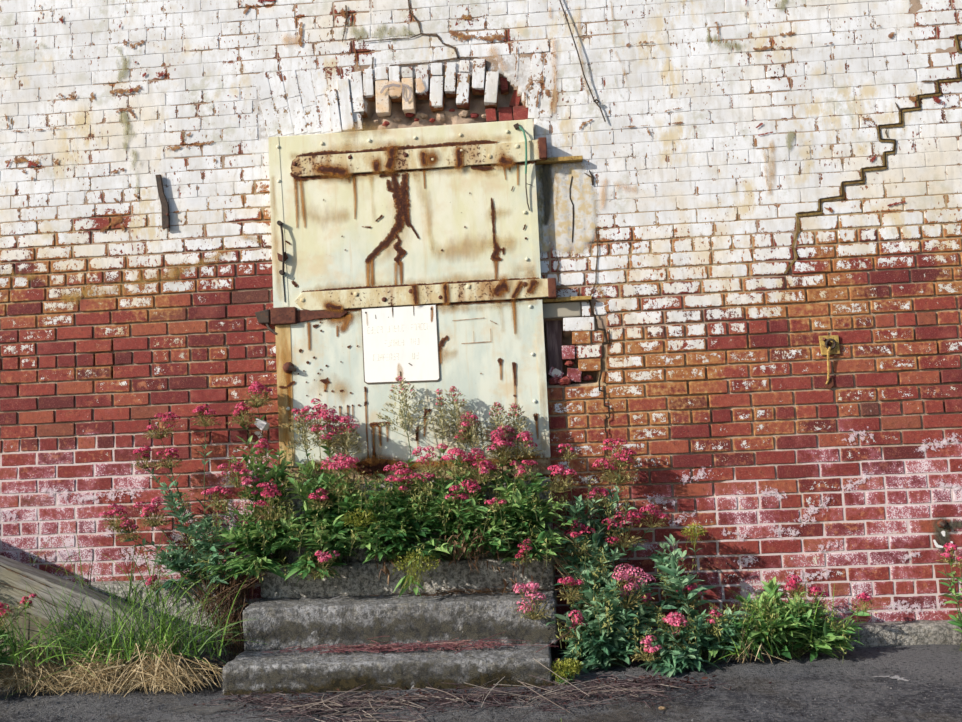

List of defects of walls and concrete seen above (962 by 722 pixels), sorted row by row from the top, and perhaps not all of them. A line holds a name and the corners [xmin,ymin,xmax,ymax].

crack [342,0,488,73]
crack [784,34,962,274]
corrosion [279,140,544,478]
efflorescence [841,426,873,445]
efflorescence [914,433,961,456]
efflorescence [677,465,714,485]
efflorescence [757,485,787,501]
efflorescence [644,493,696,528]
efflorescence [768,471,871,539]
efflorescence [734,555,758,567]
efflorescence [785,566,835,587]
efflorescence [883,599,946,614]